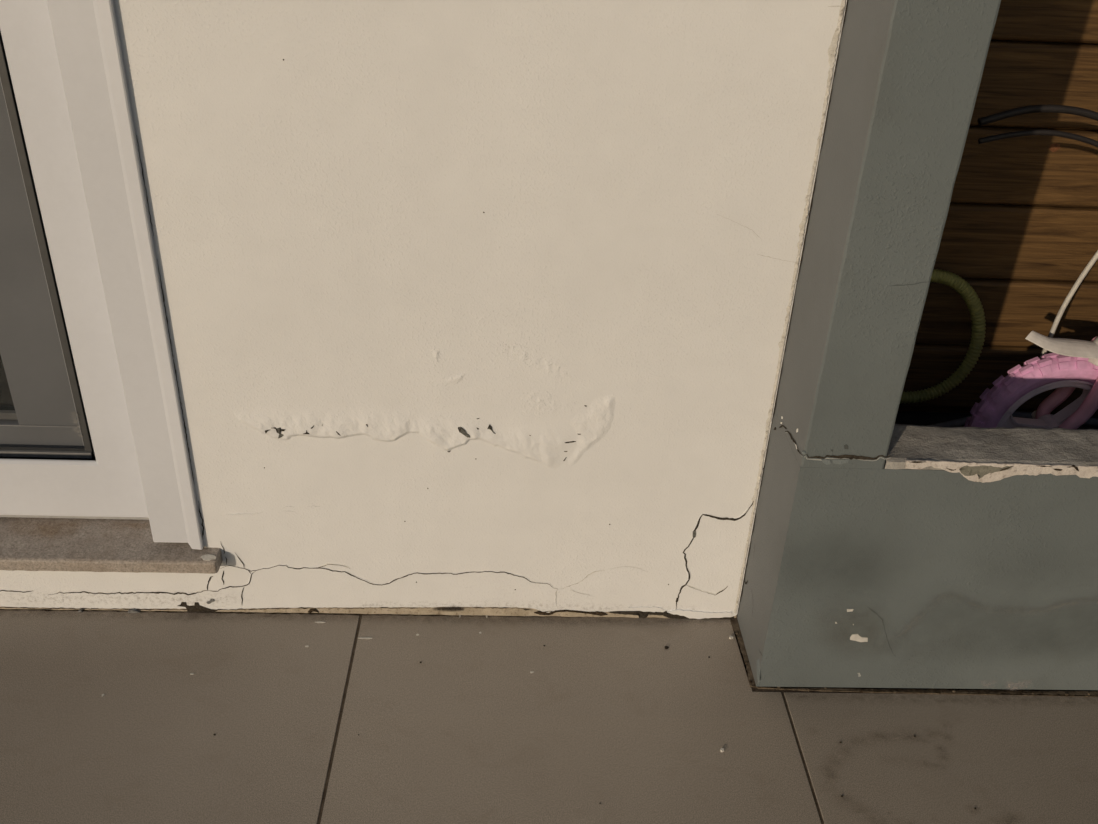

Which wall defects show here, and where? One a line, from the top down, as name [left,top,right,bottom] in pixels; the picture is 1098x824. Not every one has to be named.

crack [0,135,755,618]
crack [774,425,891,461]
spalling [905,460,1098,483]